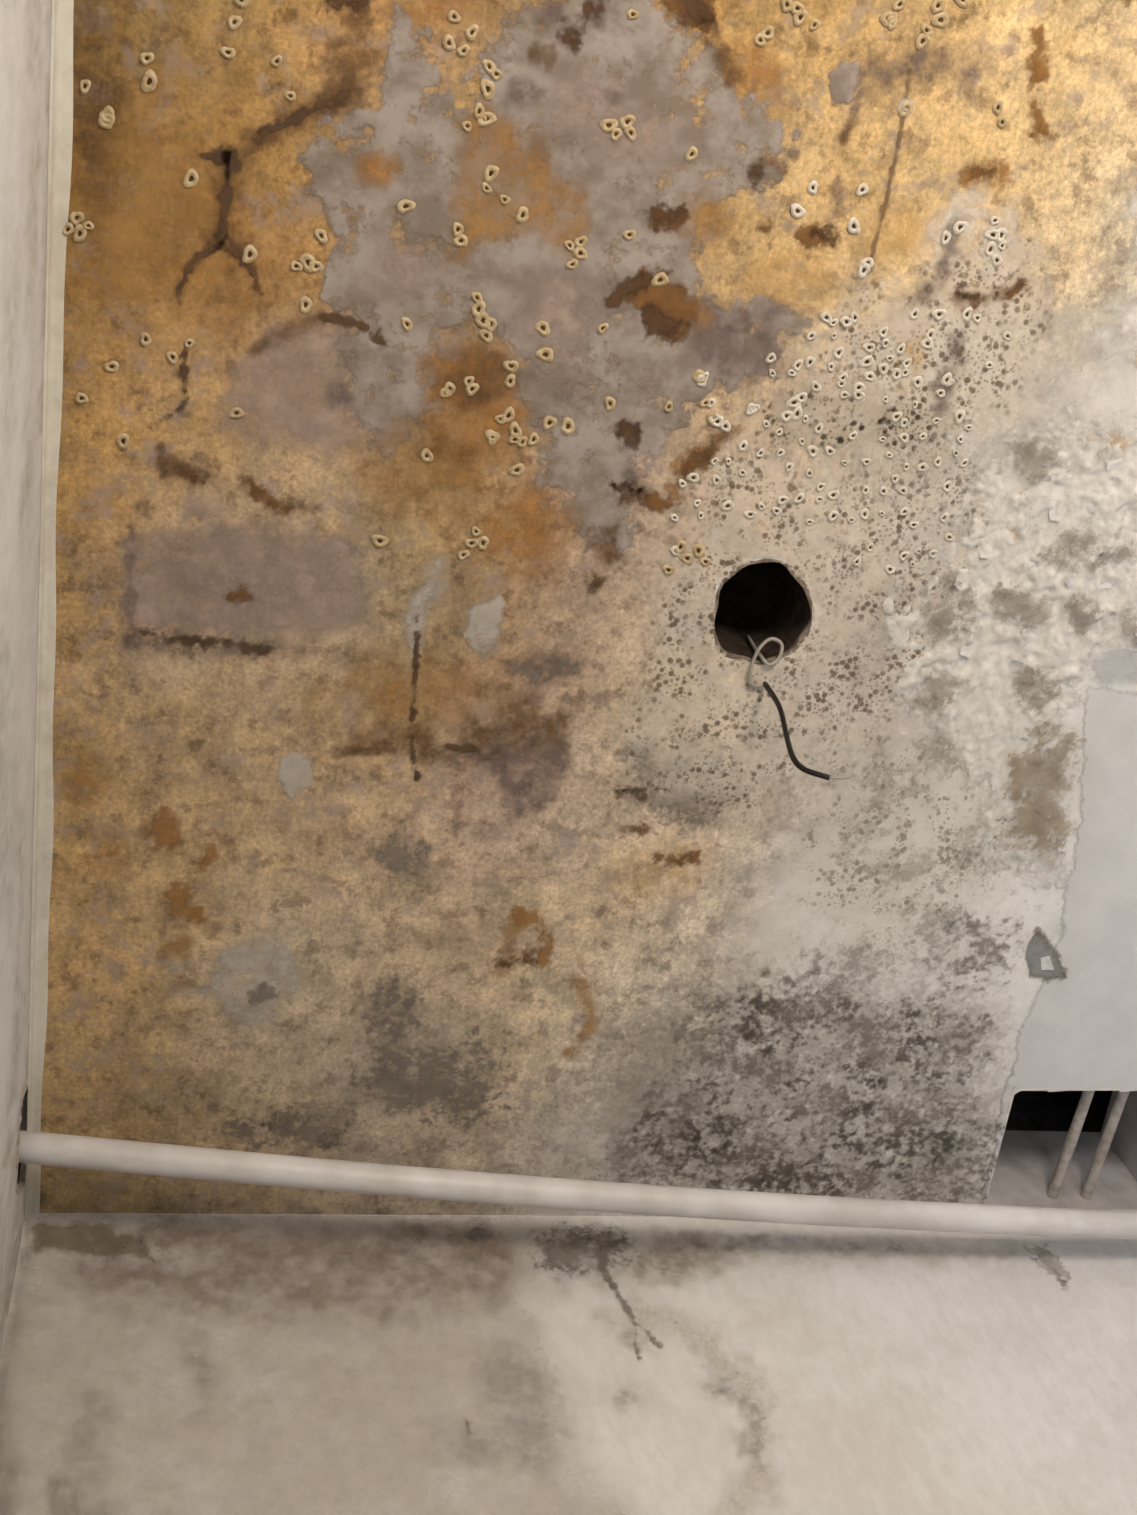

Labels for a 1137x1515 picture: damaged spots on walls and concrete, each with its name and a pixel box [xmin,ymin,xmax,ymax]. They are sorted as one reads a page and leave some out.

rust [664,0,736,87]
peeling [828,48,946,112]
rust [1026,25,1055,139]
crack [176,91,351,304]
peeling [229,0,813,555]
rust [605,266,709,342]
crack [868,68,913,274]
rust [610,425,742,513]
damp [41,0,1137,1203]
crack [343,617,480,781]
flaking render [1026,927,1067,981]
damp [0,1165,714,1515]